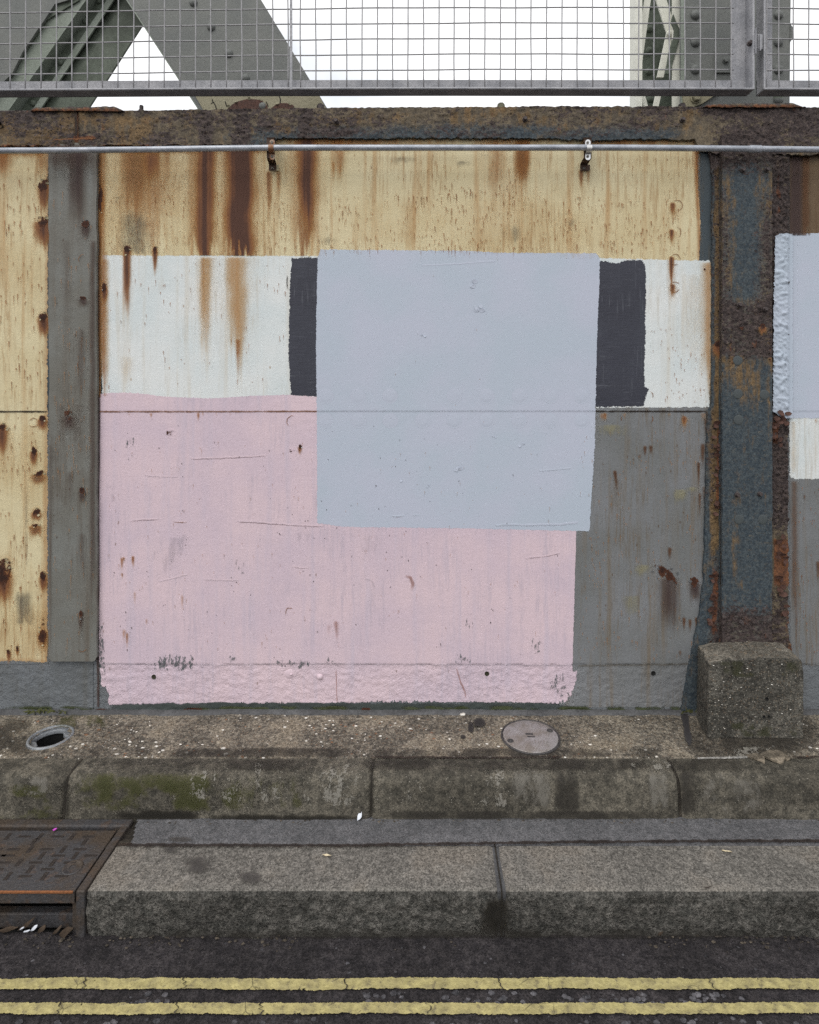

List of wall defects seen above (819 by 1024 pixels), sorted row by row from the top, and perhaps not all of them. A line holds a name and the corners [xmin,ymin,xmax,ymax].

corrosion [515,140,529,178]
corrosion [28,179,49,248]
corrosion [267,139,373,256]
corrosion [0,292,49,336]
corrosion [41,145,258,605]
corrosion [0,415,47,483]
corrosion [10,508,41,556]
corrosion [0,558,24,603]
corrosion [36,565,47,591]
corrosion [651,548,719,626]
corrosion [38,623,47,646]
corrosion [97,624,107,710]